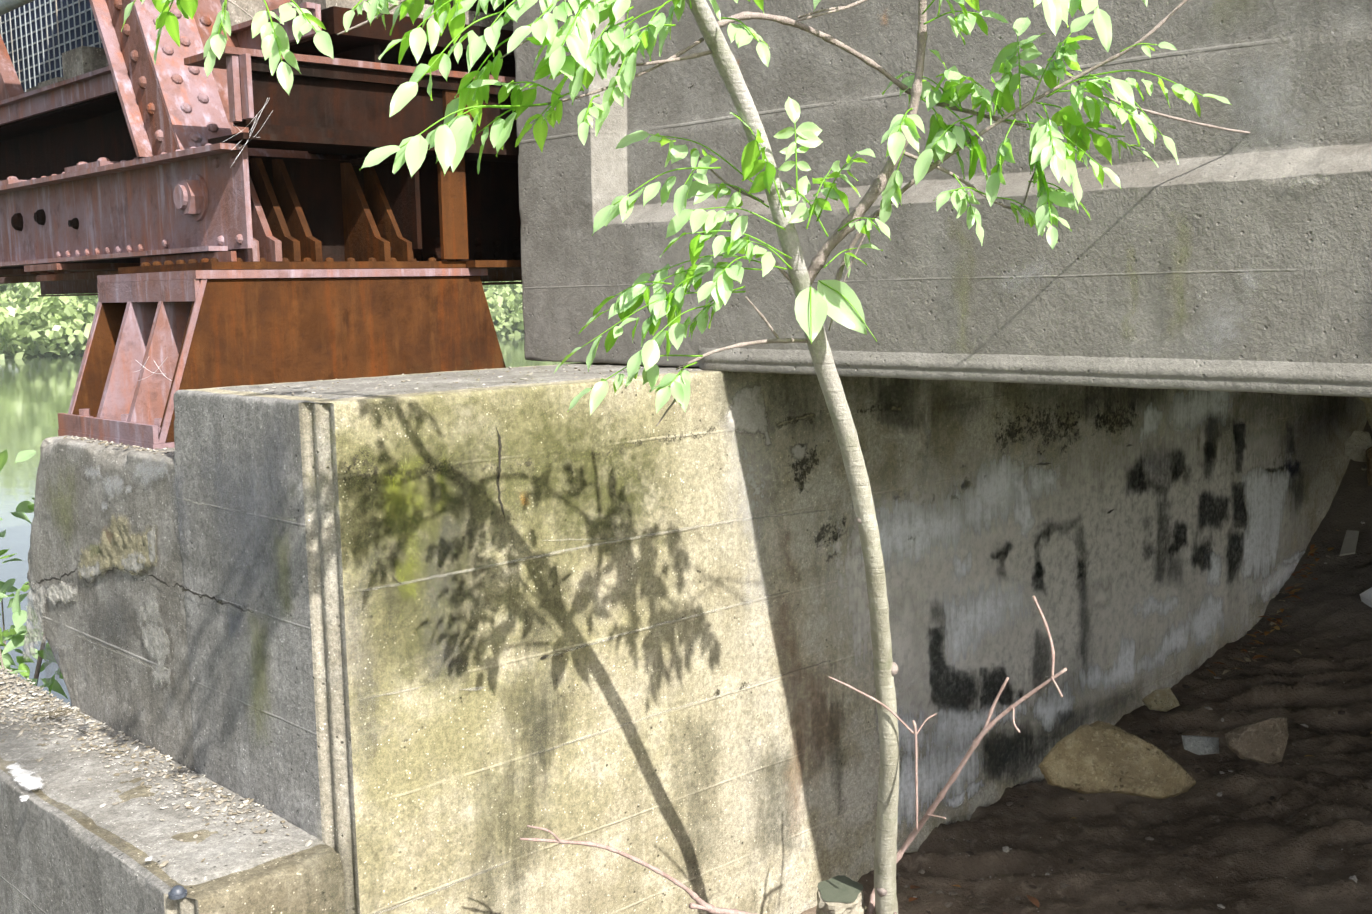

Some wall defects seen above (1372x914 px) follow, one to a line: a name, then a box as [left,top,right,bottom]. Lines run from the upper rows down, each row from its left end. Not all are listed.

crack [495,426,505,518]
damp [572,451,640,527]
spalling [22,470,158,678]
crack [25,543,253,613]
damp [374,477,465,652]
spalling [138,591,169,683]